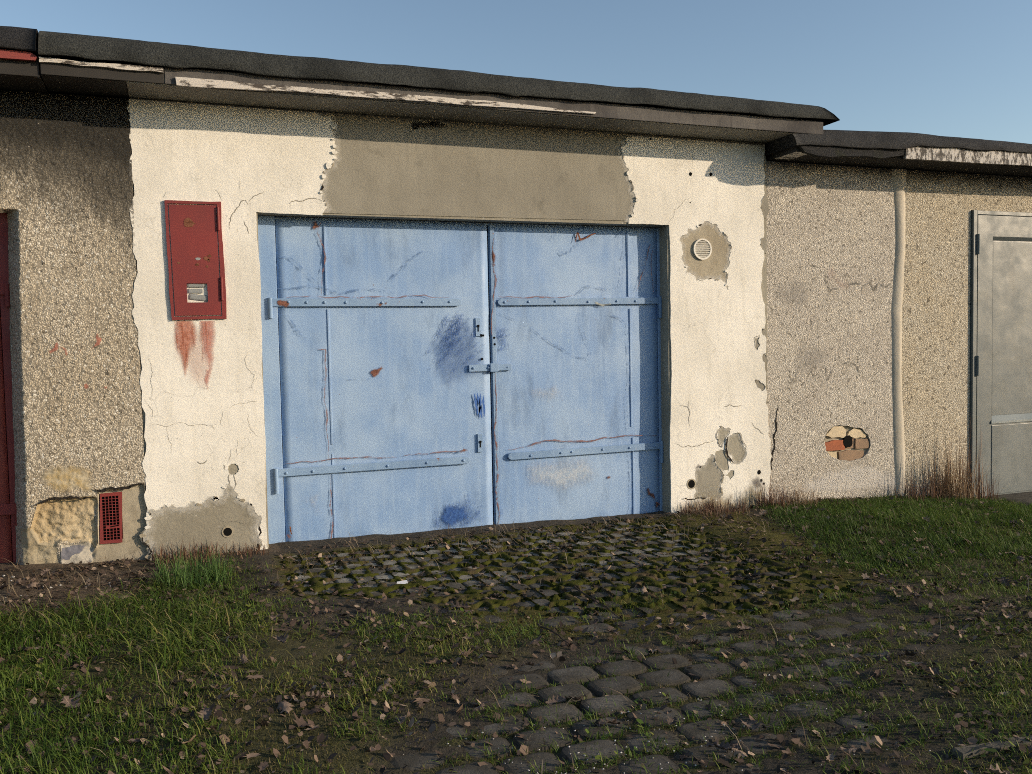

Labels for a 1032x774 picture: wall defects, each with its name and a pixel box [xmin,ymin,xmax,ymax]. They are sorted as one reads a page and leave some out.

rust [177,321,213,383]
crack [146,357,257,489]
flaking render [694,426,747,501]
flaking render [825,425,870,461]
flaking render [20,483,142,565]
flaking render [139,504,171,559]